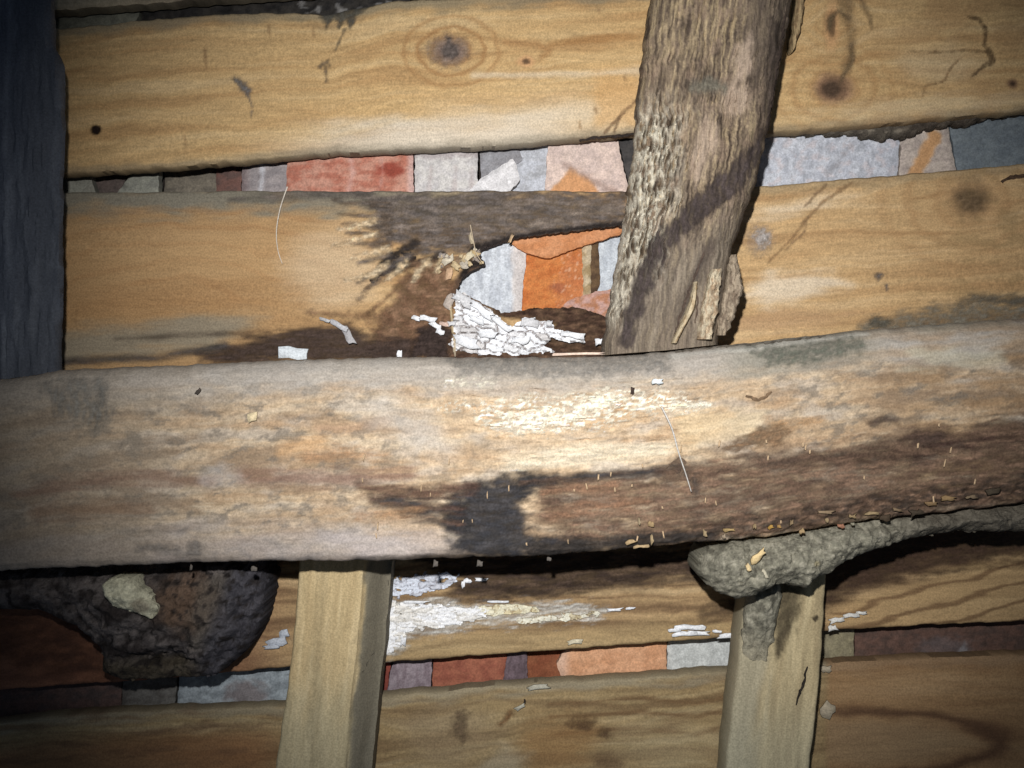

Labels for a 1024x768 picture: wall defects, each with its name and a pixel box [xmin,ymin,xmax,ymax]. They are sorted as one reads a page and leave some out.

damp [300,190,627,280]
peeling [411,289,602,349]
damp [62,324,465,371]
peeling [461,387,712,433]
damp [357,419,1024,603]
peeling [393,571,488,604]
peeling [479,600,636,624]